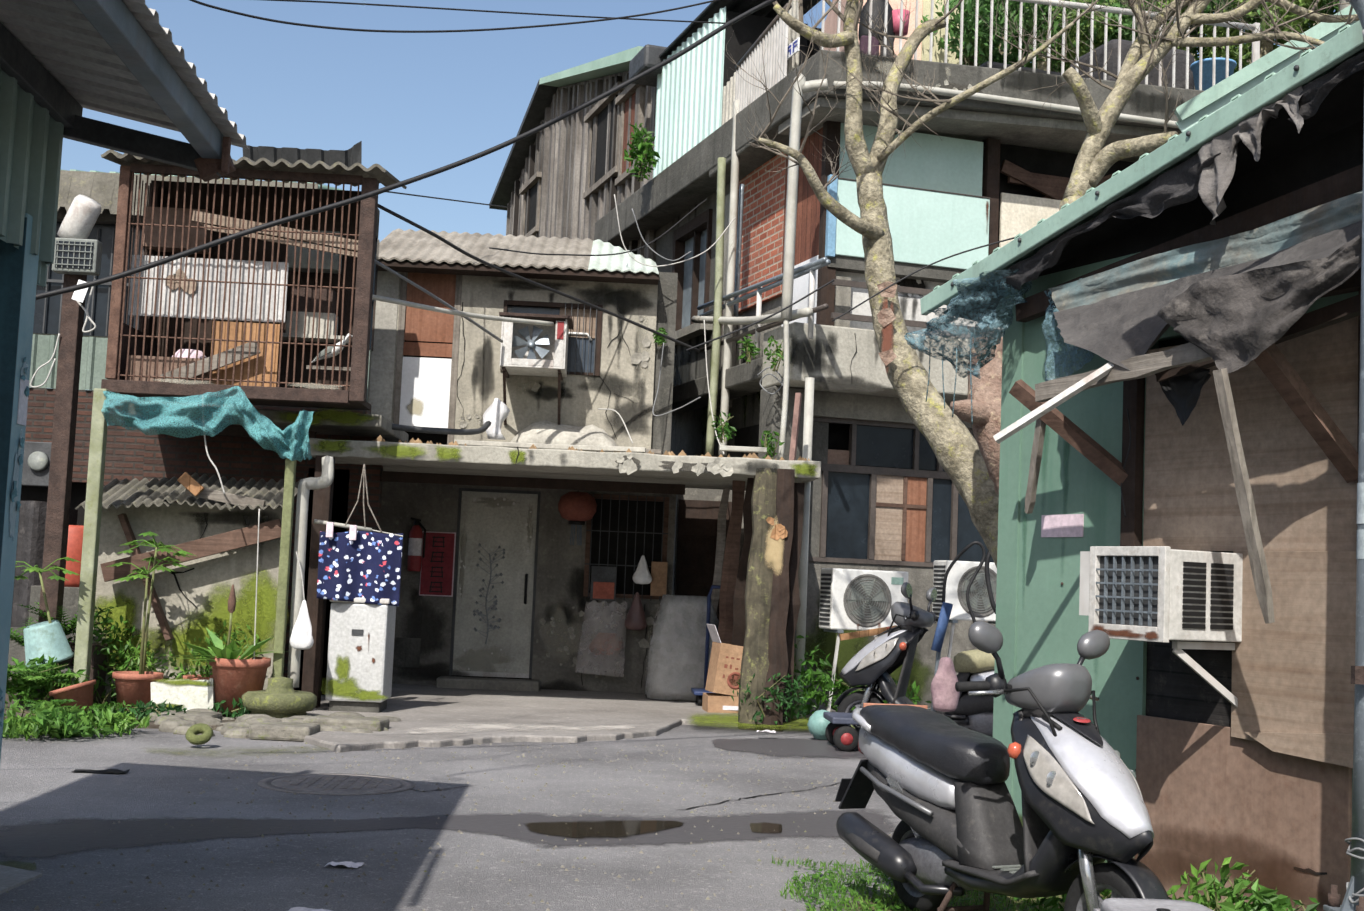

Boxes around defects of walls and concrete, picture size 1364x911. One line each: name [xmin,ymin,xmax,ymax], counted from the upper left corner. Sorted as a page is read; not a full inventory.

water stain [500,281,566,302]
water stain [472,341,493,395]
water stain [529,286,652,434]
water stain [790,335,882,392]
water stain [740,461,778,473]
water stain [218,594,261,656]